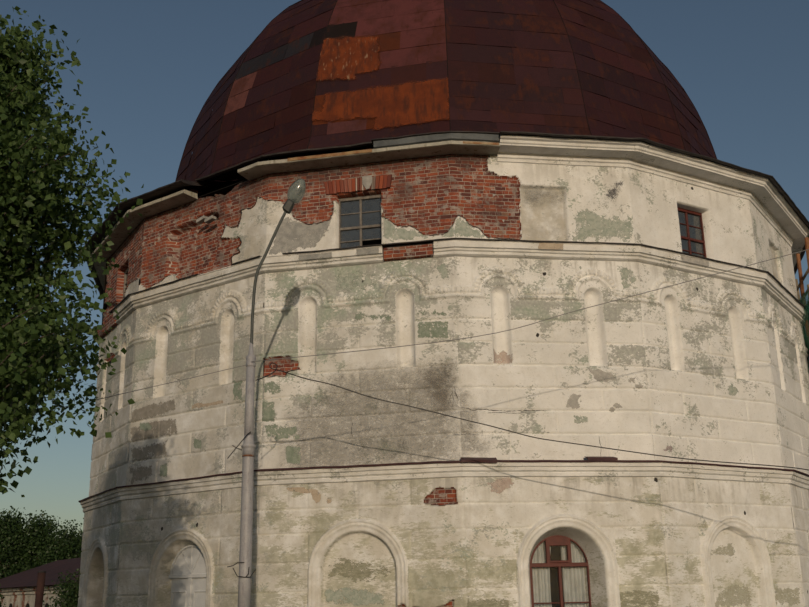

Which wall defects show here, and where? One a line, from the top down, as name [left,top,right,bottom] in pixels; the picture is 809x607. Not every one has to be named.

corrosion [316,36,381,81]
corrosion [312,78,450,130]
peeling [572,209,633,242]
spalling [96,154,522,346]
peeling [493,349,513,364]
spalling [262,355,301,464]
spalling [424,487,458,506]
peeling [325,558,391,606]
peeling [467,599,509,607]